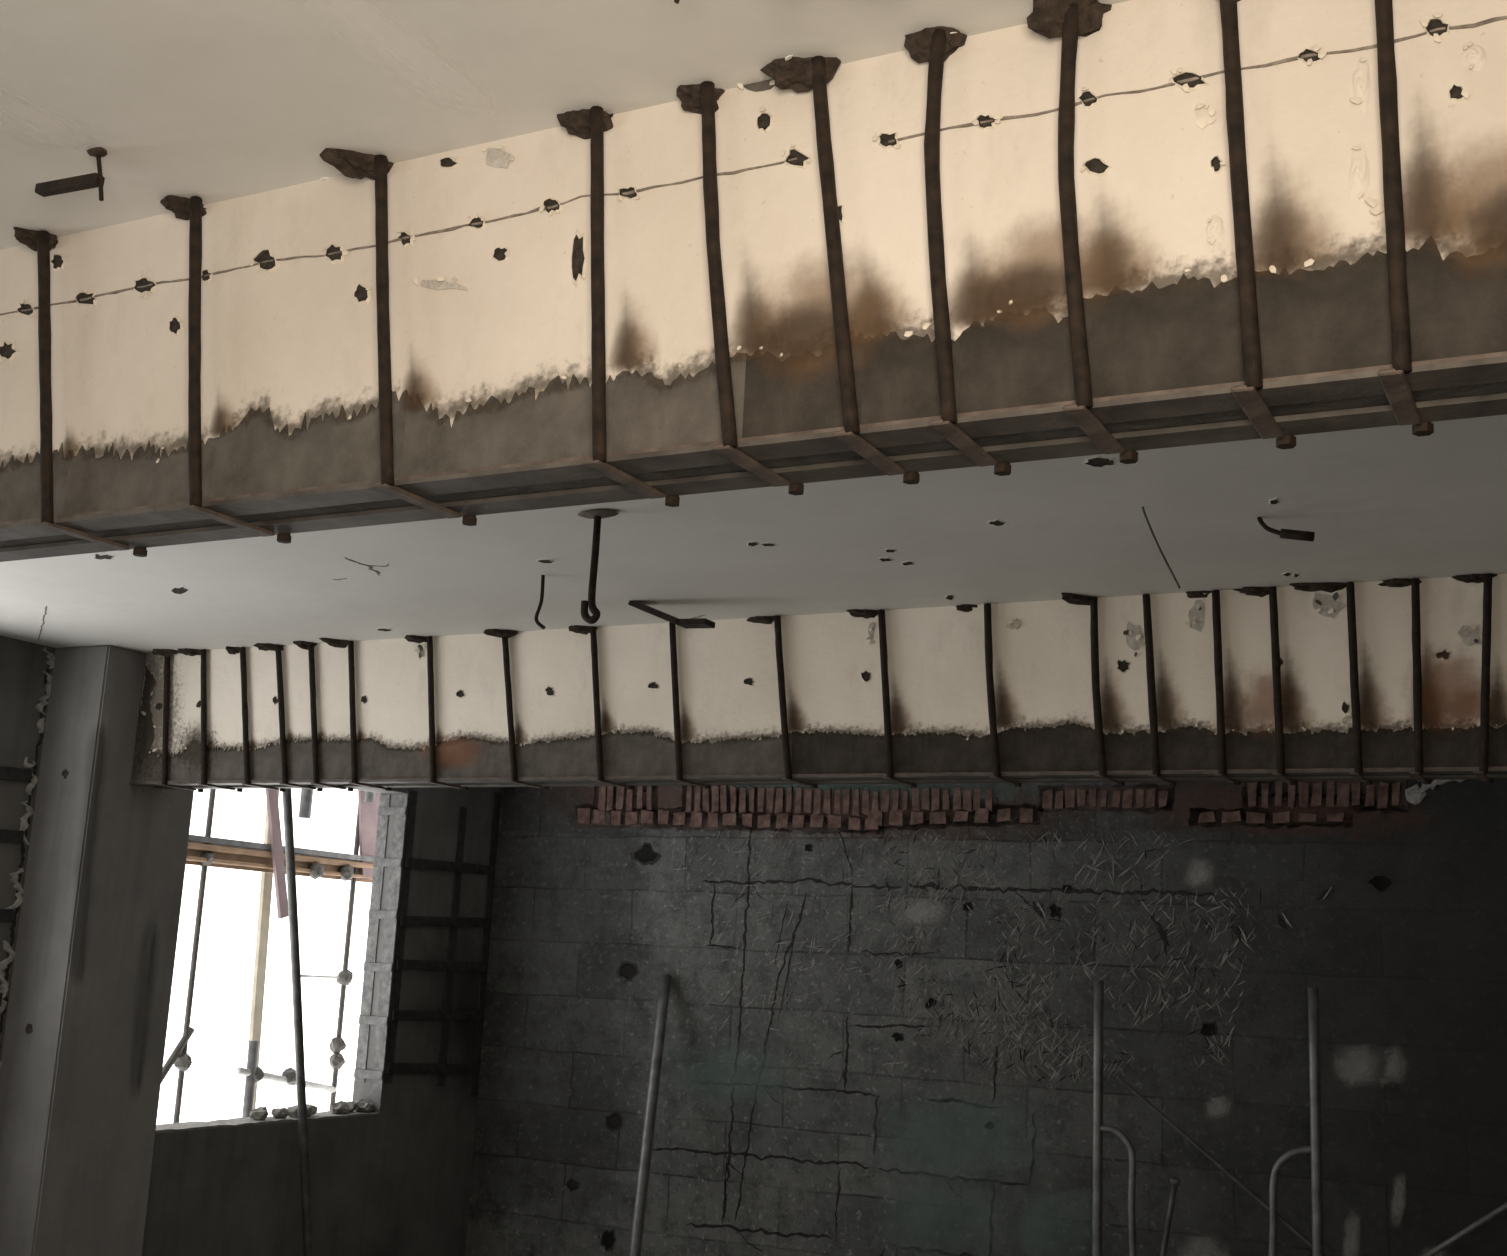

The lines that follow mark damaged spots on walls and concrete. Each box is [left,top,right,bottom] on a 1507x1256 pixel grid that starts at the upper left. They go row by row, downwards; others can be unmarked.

spalling [737,79,775,133]
spalling [1168,67,1216,130]
spalling [1448,84,1470,103]
spalling [439,156,460,169]
spalling [781,144,812,169]
spalling [872,132,901,150]
spalling [1080,158,1112,177]
spalling [1210,155,1226,174]
peeling [1406,234,1507,362]
peeling [0,228,1393,522]
flaking render [131,668,1480,866]
crack [652,829,1217,1256]